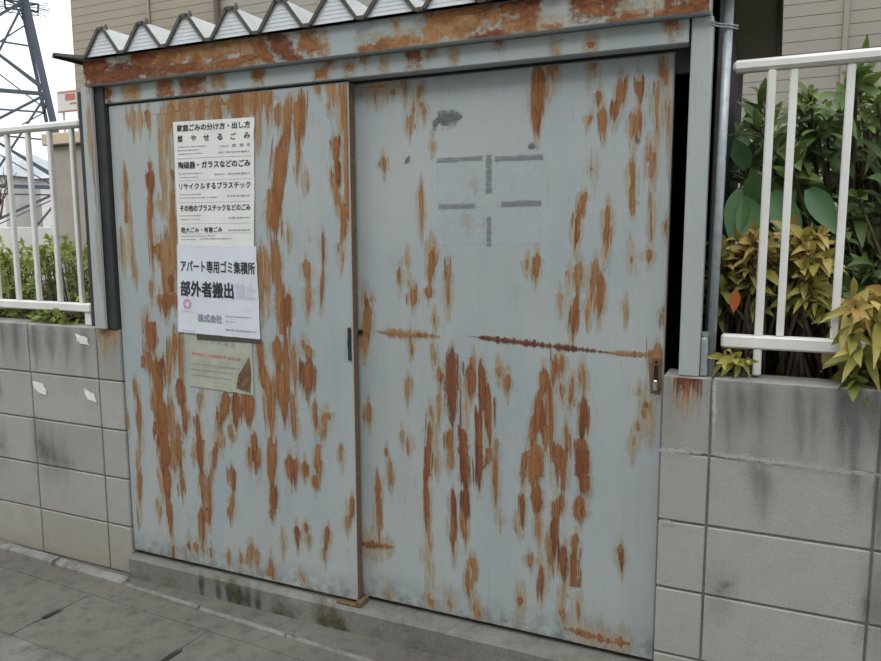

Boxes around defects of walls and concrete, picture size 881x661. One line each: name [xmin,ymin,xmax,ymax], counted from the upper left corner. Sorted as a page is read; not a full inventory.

corrosion [83,0,710,621]
corrosion [514,191,632,653]